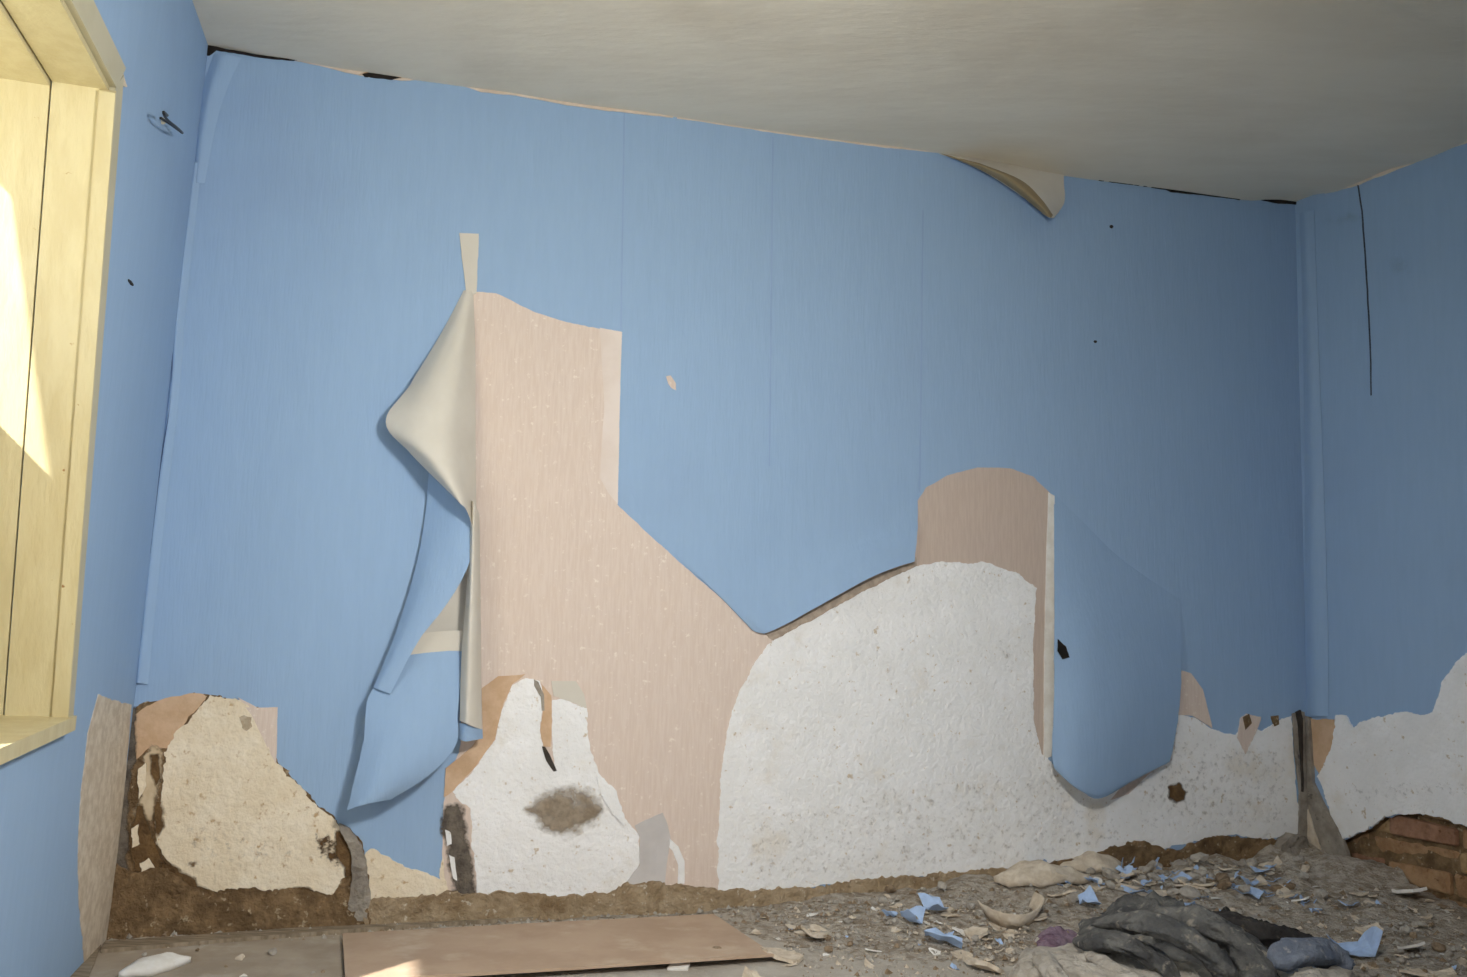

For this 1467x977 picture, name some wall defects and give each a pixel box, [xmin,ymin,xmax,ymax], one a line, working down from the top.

crack [1357,185,1372,396]
flaking render [106,466,1299,940]
flaking render [1311,653,1467,908]